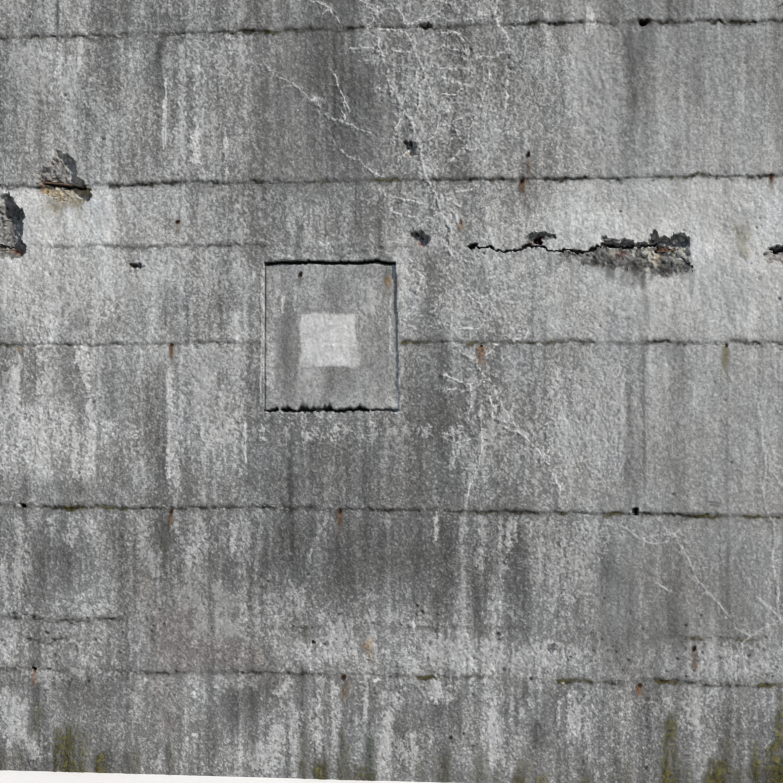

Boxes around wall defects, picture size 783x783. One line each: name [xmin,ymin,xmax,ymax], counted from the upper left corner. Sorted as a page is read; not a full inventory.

crack [310,0,340,22]
damp [8,35,83,136]
damp [162,33,202,179]
crack [266,65,371,133]
spalling [0,181,28,260]
spalling [34,148,93,205]
crack [334,0,562,498]
spalling [467,229,694,280]
spalling [762,244,783,265]
damp [0,258,116,484]
damp [153,344,247,478]
damp [546,351,632,485]